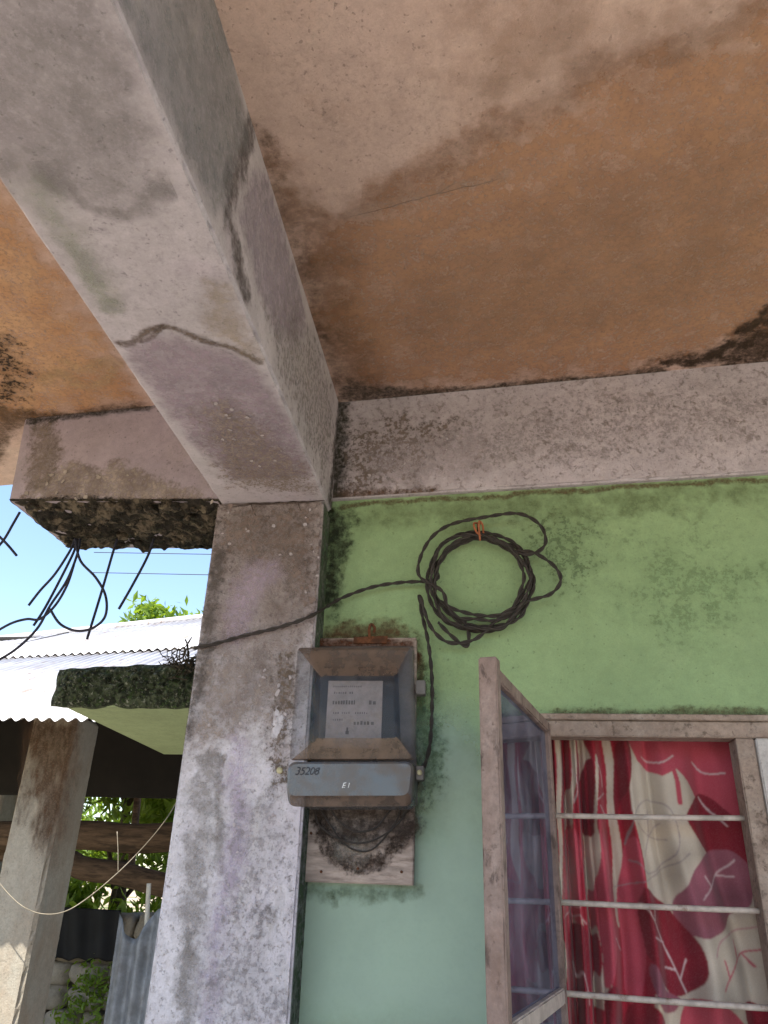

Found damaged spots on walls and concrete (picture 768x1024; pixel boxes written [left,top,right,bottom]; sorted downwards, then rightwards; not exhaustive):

water stain [123,0,768,401]
water stain [0,210,141,488]
spalling [0,459,231,660]
water stain [315,504,360,648]
water stain [291,699,487,1024]